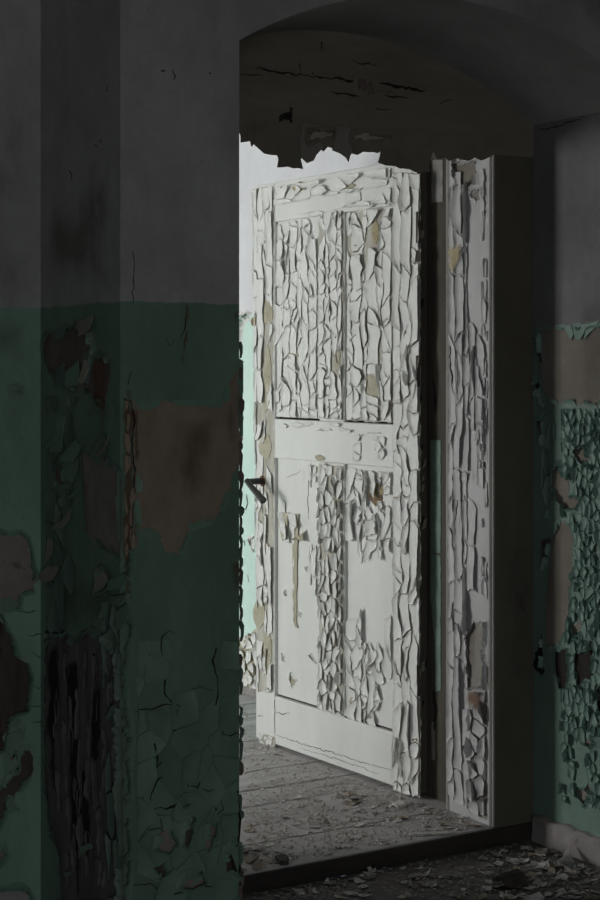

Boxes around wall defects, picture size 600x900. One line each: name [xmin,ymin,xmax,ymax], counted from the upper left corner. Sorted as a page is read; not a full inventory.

crack [240,60,449,110]
peeling [41,320,98,394]
peeling [0,528,39,612]
peeling [123,107,493,900]
peeling [532,320,600,810]
spalling [0,565,126,900]
water stain [47,650,89,892]
crack [136,648,219,731]
crack [149,743,242,886]